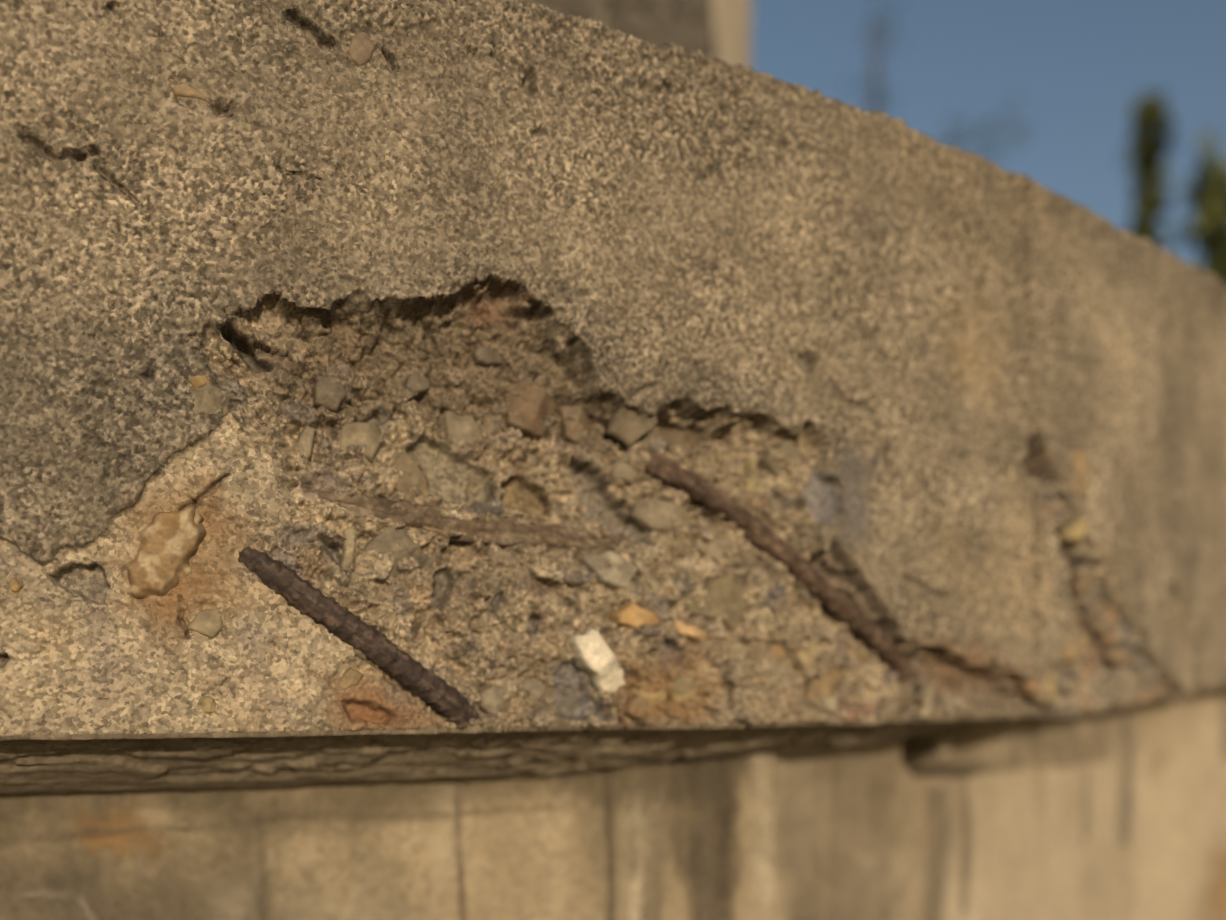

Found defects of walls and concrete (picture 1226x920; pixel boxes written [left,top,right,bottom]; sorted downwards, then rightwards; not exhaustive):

corrosion [344,692,408,724]
spalling [0,275,1117,779]
crack [995,432,1185,715]